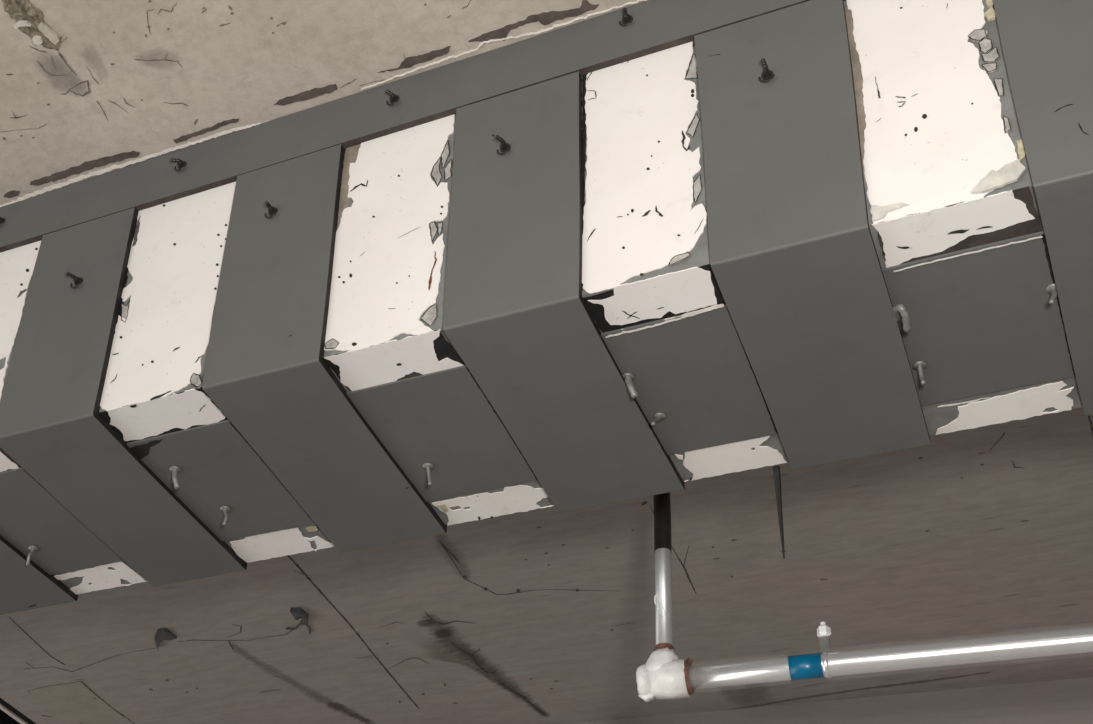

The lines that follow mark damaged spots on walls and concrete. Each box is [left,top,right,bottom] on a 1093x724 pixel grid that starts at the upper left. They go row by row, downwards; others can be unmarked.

peeling [0,241,41,401]
peeling [100,182,236,441]
peeling [324,114,463,391]
peeling [582,42,717,325]
peeling [845,0,1035,268]
peeling [936,381,1074,435]
crack [9,617,154,724]
crack [180,624,292,650]
peeling [230,526,334,563]
crack [287,555,427,709]
peeling [432,485,554,526]
crack [439,540,599,595]